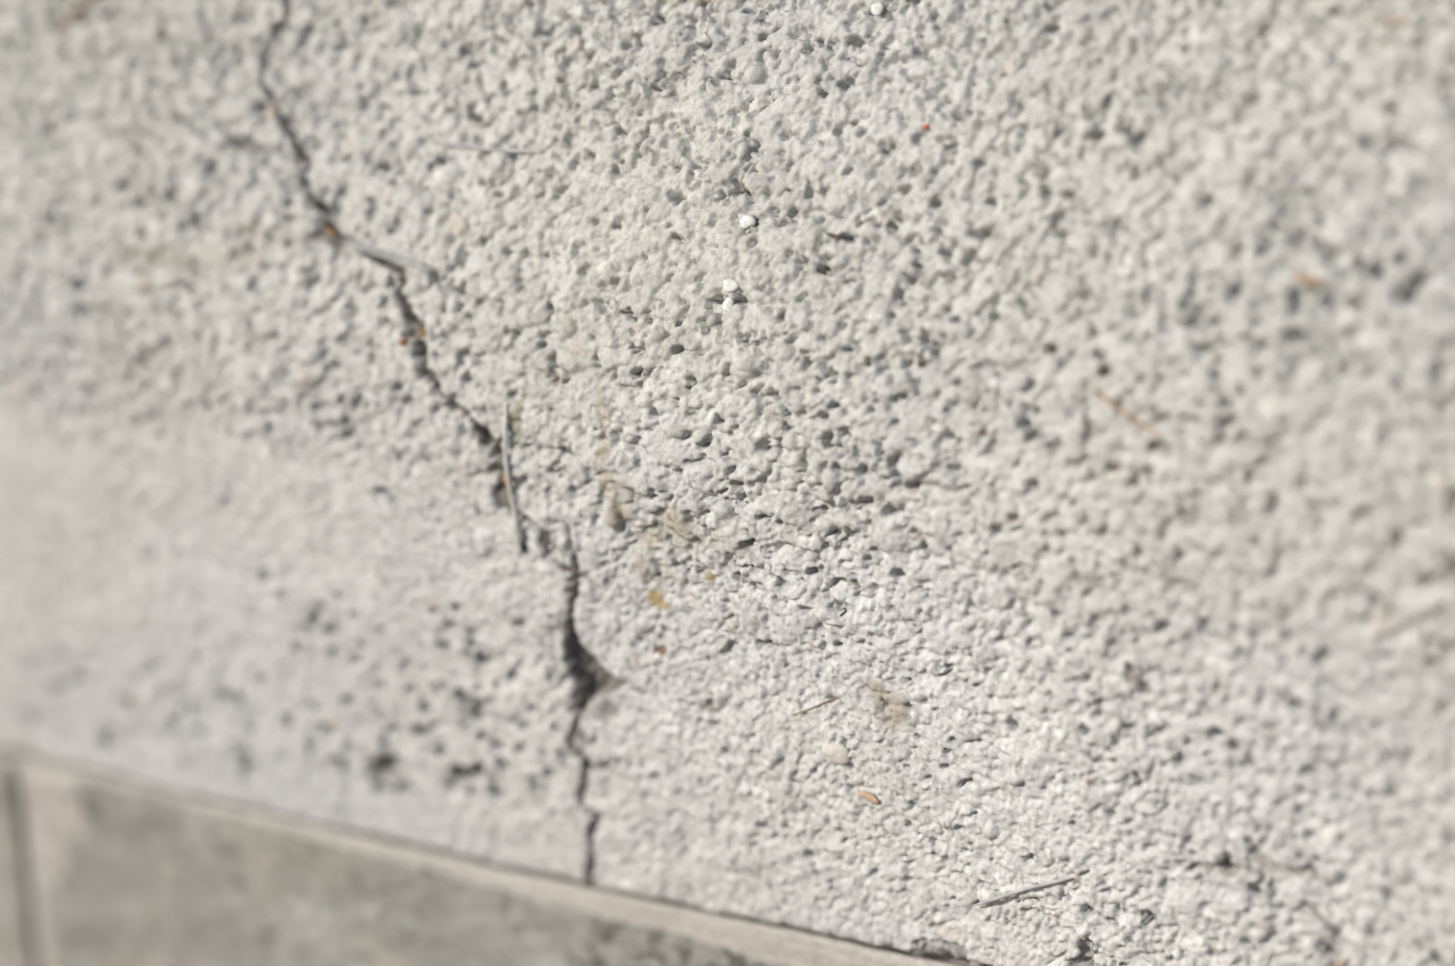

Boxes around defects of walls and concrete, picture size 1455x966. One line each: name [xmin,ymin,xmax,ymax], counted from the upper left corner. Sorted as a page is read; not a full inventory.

crack [233,0,659,881]
crack [681,699,721,713]